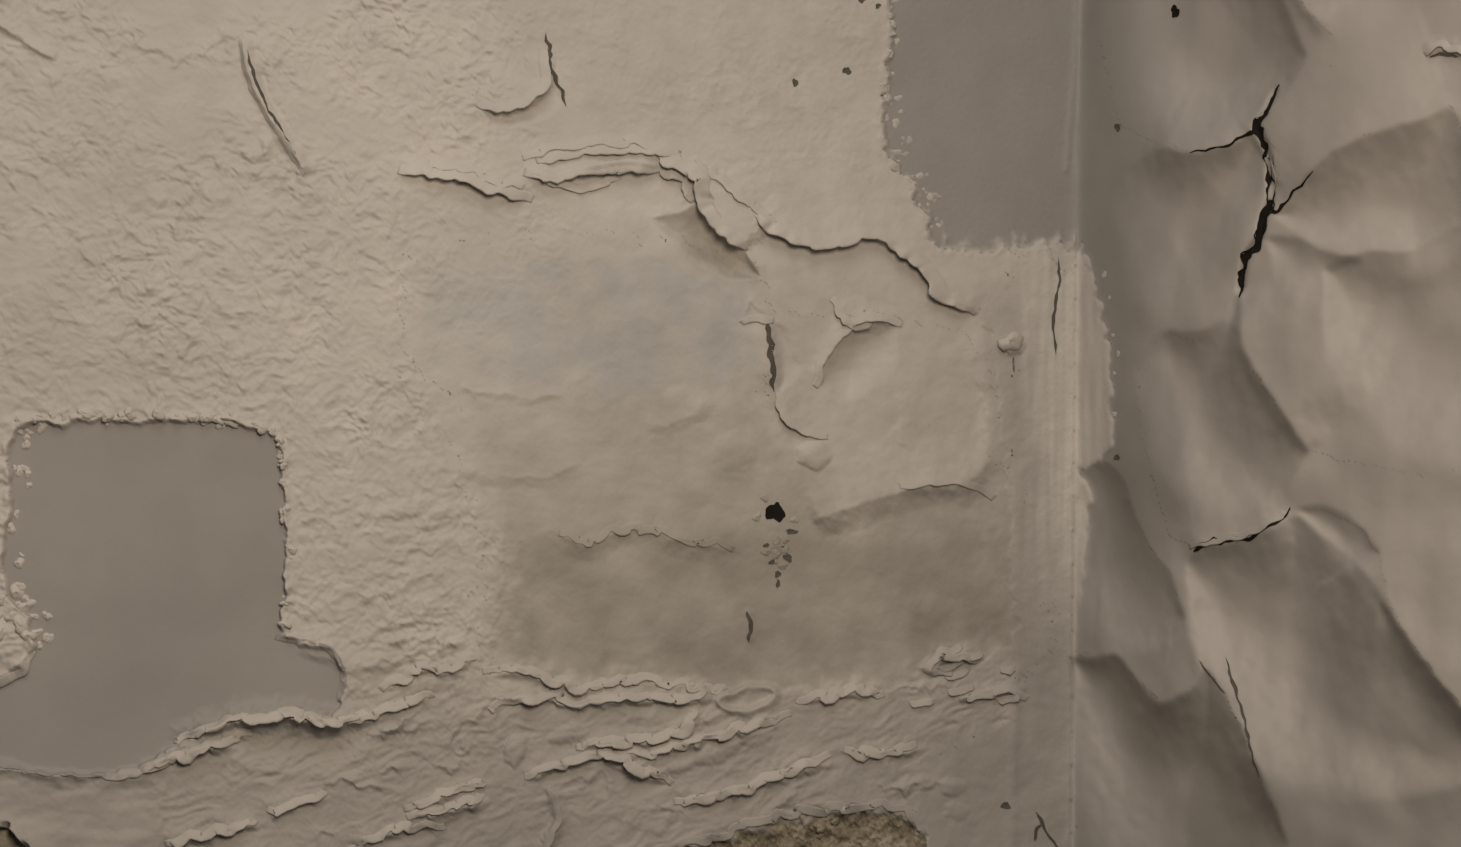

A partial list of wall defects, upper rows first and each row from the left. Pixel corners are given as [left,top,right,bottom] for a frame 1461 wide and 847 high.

peeling [1424,40,1461,58]
peeling [397,0,1080,316]
crack [1190,84,1313,298]
peeling [0,406,1030,847]
crack [1188,507,1290,552]